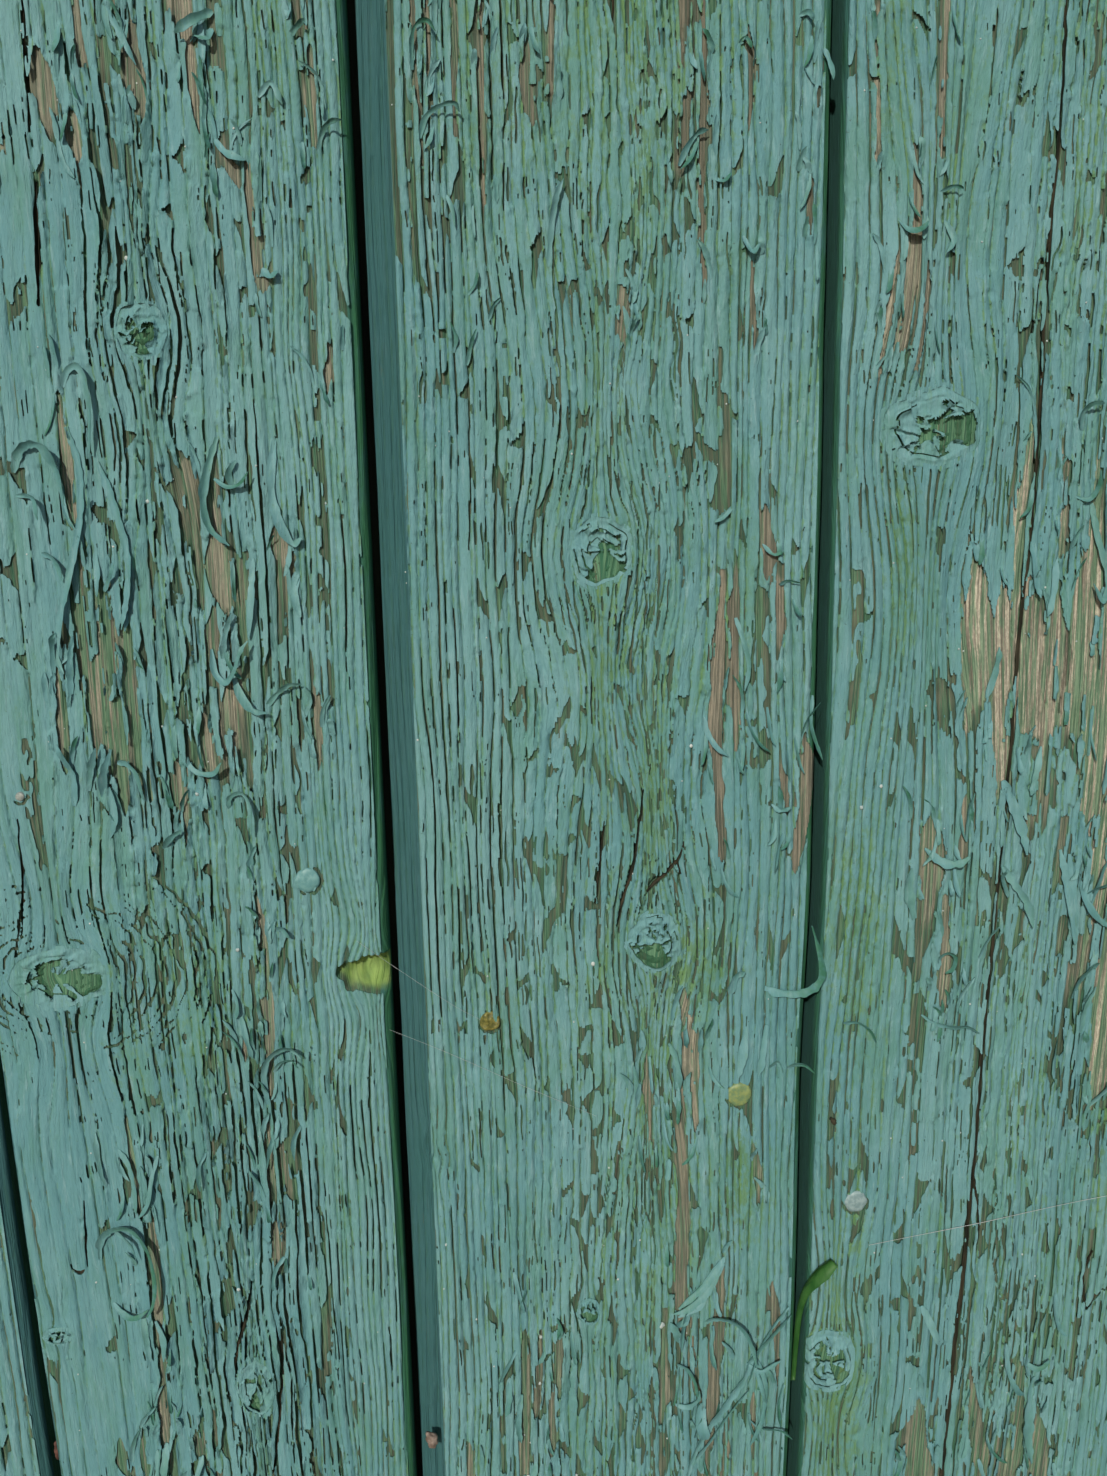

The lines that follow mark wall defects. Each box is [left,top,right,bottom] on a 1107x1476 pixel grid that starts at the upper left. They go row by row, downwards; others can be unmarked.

peeling [35,0,86,178]
peeling [169,0,278,317]
peeling [409,0,499,238]
peeling [873,0,964,376]
peeling [10,334,336,1291]
peeling [701,547,823,898]
peeling [902,785,1000,1042]
crack [940,0,1067,1476]
peeling [956,375,1107,1110]
peeling [93,1116,215,1476]
peeling [620,986,815,1476]
crack [1076,1249,1107,1317]